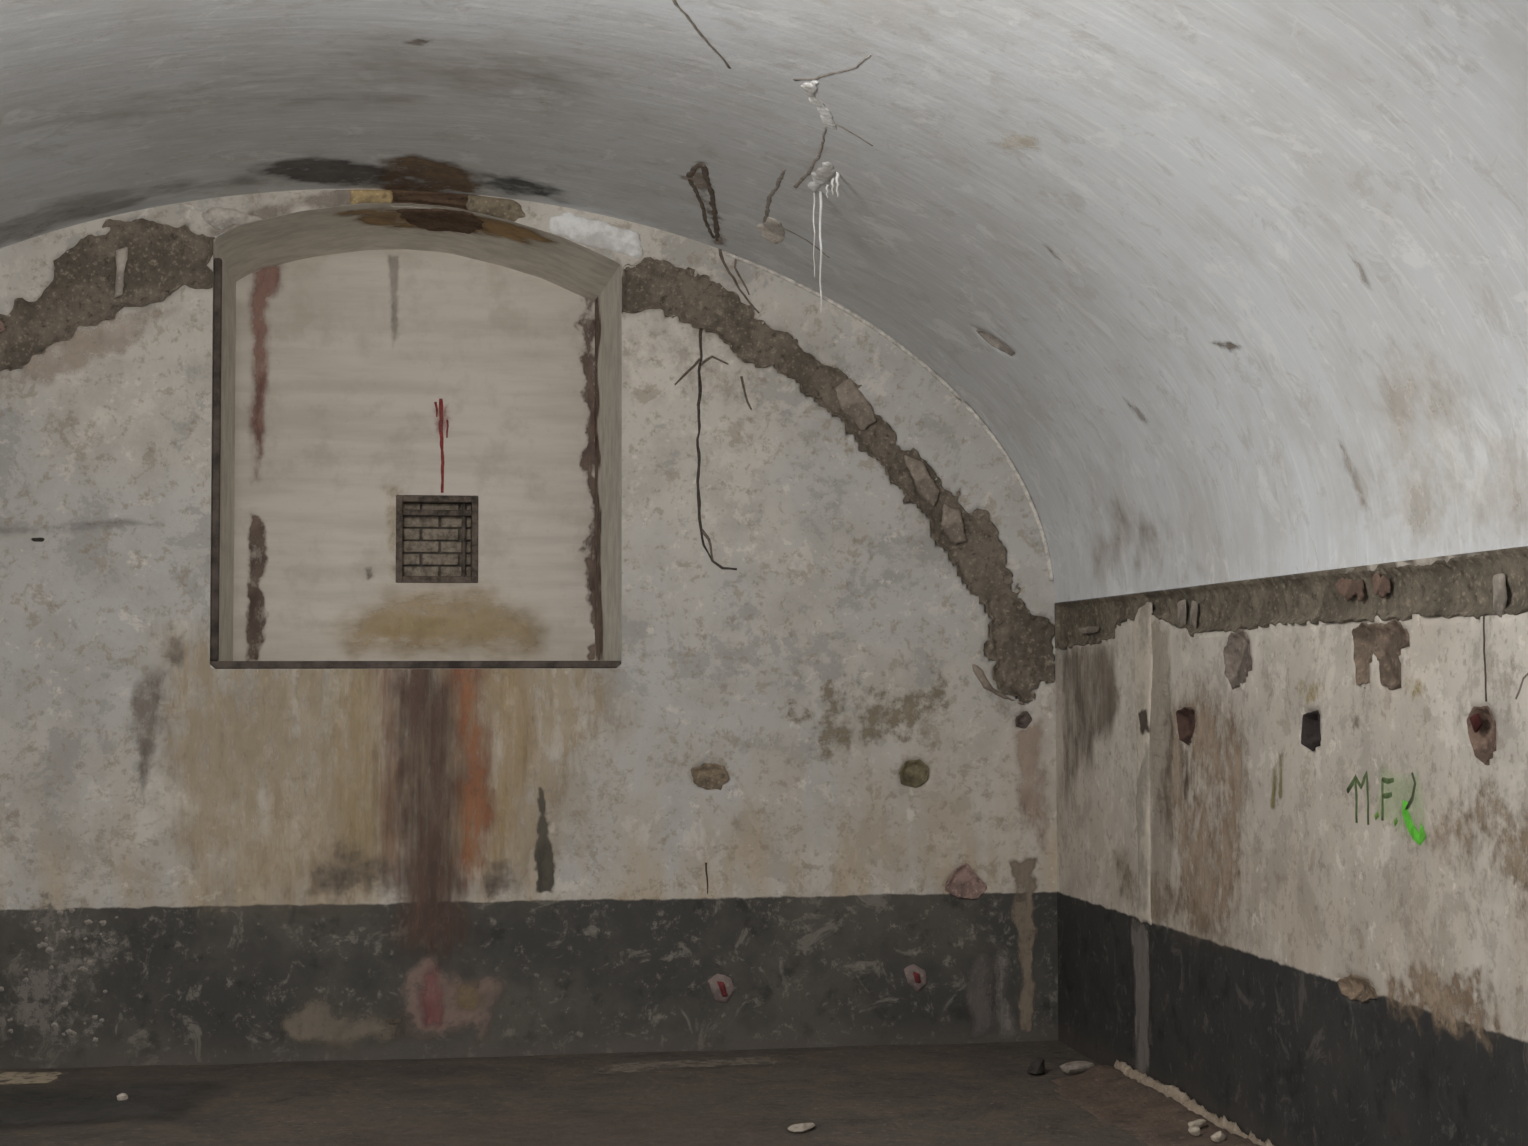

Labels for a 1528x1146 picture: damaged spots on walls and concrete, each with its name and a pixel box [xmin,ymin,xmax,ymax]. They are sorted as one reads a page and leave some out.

crack [672,0,731,69]
leakage [485,178,558,196]
crack [683,55,873,314]
spalling [0,207,262,371]
peeling [251,265,279,455]
spalling [622,257,1528,729]
leakage [134,639,605,895]
rust [349,669,506,956]
leakage [1064,648,1116,766]
peeling [1138,710,1149,734]
leakage [1131,696,1242,1074]
peeling [281,957,503,1047]